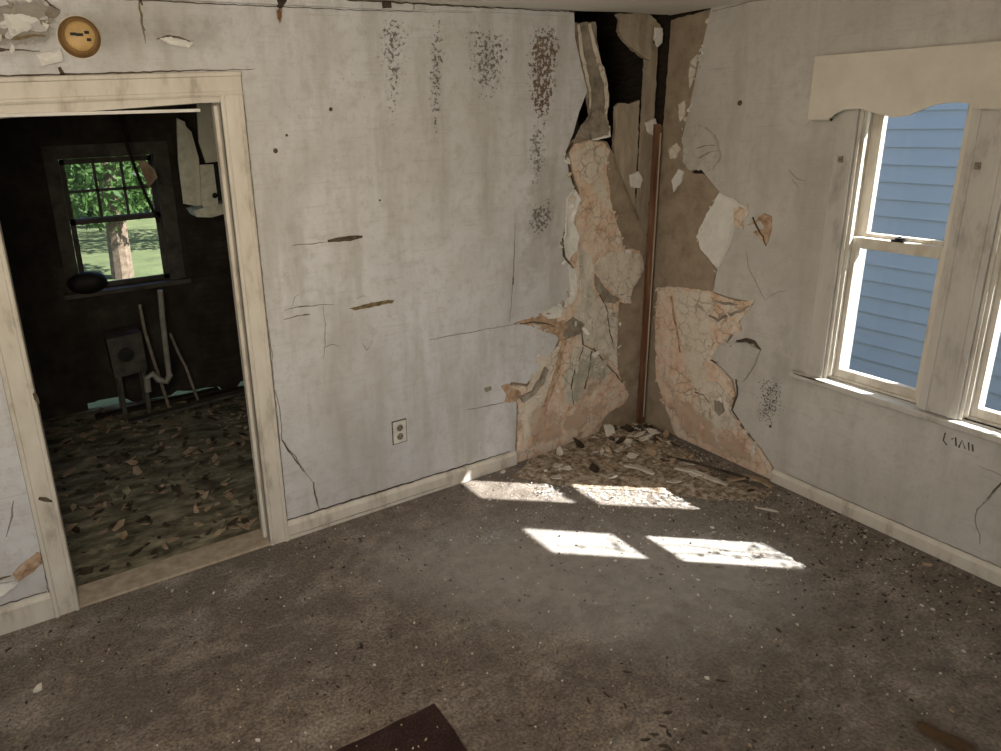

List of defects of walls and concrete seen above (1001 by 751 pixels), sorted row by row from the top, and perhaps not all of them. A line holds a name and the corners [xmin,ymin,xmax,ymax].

peeling [0,0,65,75]
leakage [381,20,406,112]
leakage [430,19,445,132]
leakage [470,31,508,97]
mould [526,28,560,183]
leakage [529,199,554,234]
flaking render [484,9,774,479]
crack [268,294,394,508]
crack [974,465,1001,544]
peeling [0,552,42,597]